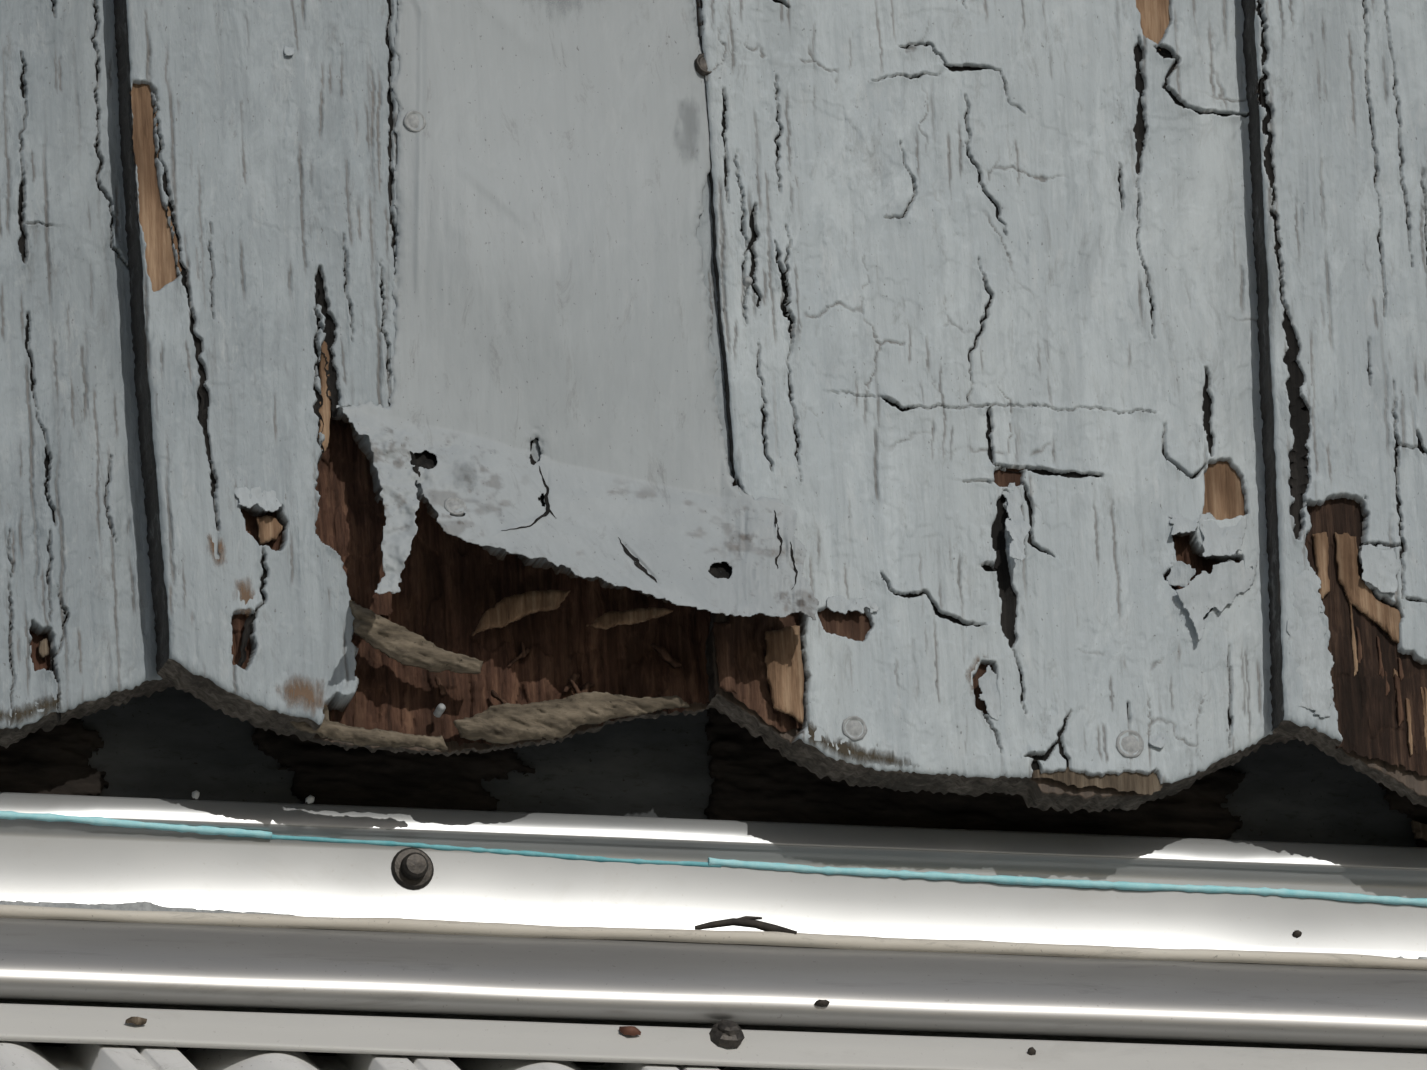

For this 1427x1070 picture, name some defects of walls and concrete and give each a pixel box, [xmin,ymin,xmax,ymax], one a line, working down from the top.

peeling [130,84,182,292]
crack [153,106,218,529]
crack [313,0,396,453]
crack [720,93,793,338]
crack [1118,0,1310,539]
peeling [235,486,282,512]
peeling [817,595,879,642]
crack [881,279,1100,702]
crack [1027,716,1069,774]
peeling [1166,461,1258,641]
peeling [1287,569,1334,718]
peeling [1360,544,1401,593]